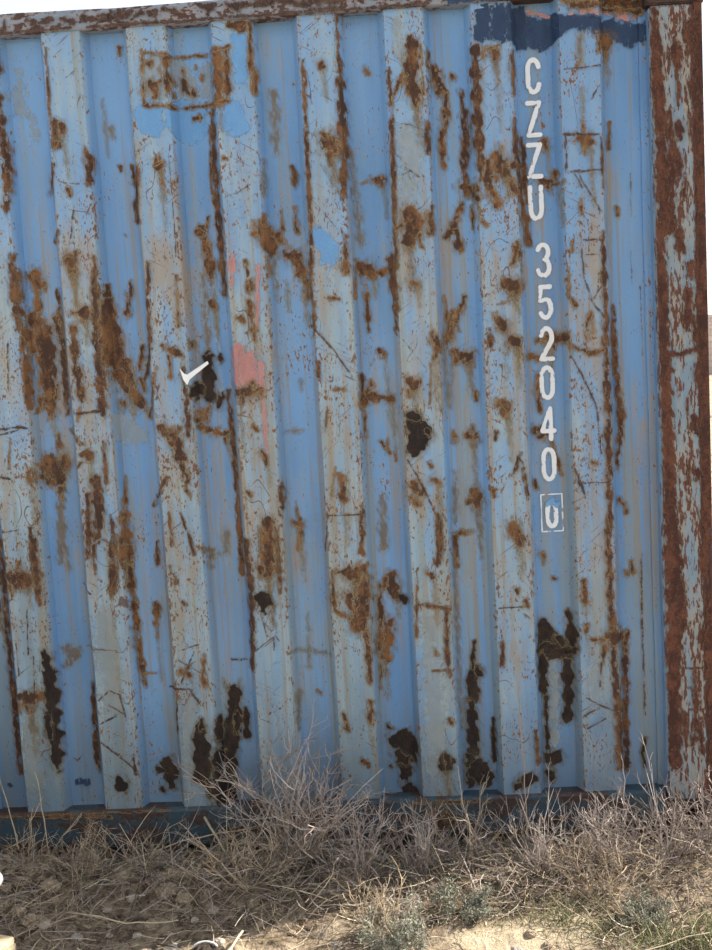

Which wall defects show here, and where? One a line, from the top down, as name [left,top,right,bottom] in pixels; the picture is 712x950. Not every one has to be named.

rust [0,0,647,833]
rust [561,0,712,770]